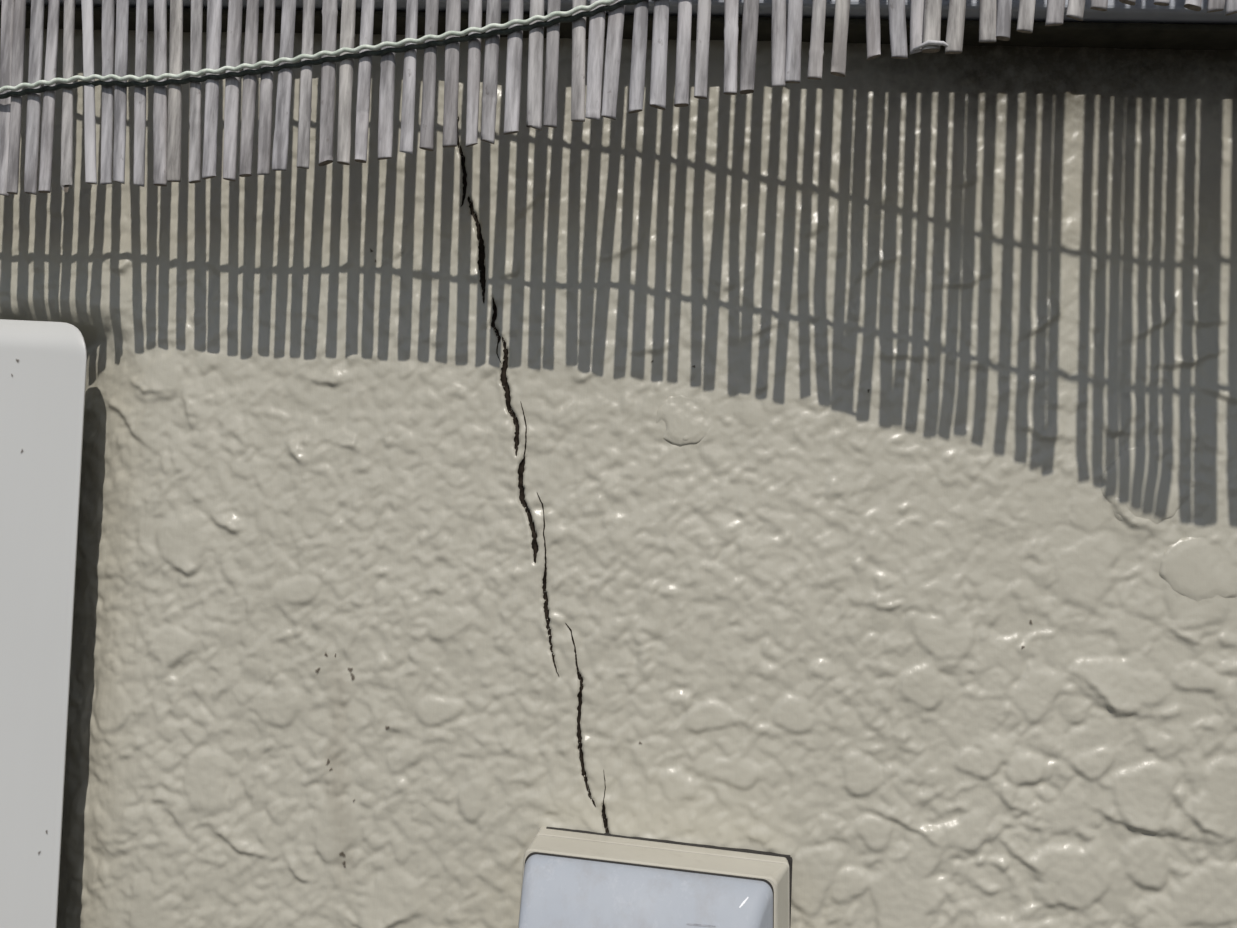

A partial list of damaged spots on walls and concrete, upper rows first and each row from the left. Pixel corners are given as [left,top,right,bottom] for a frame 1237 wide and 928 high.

crack [457,116,609,833]